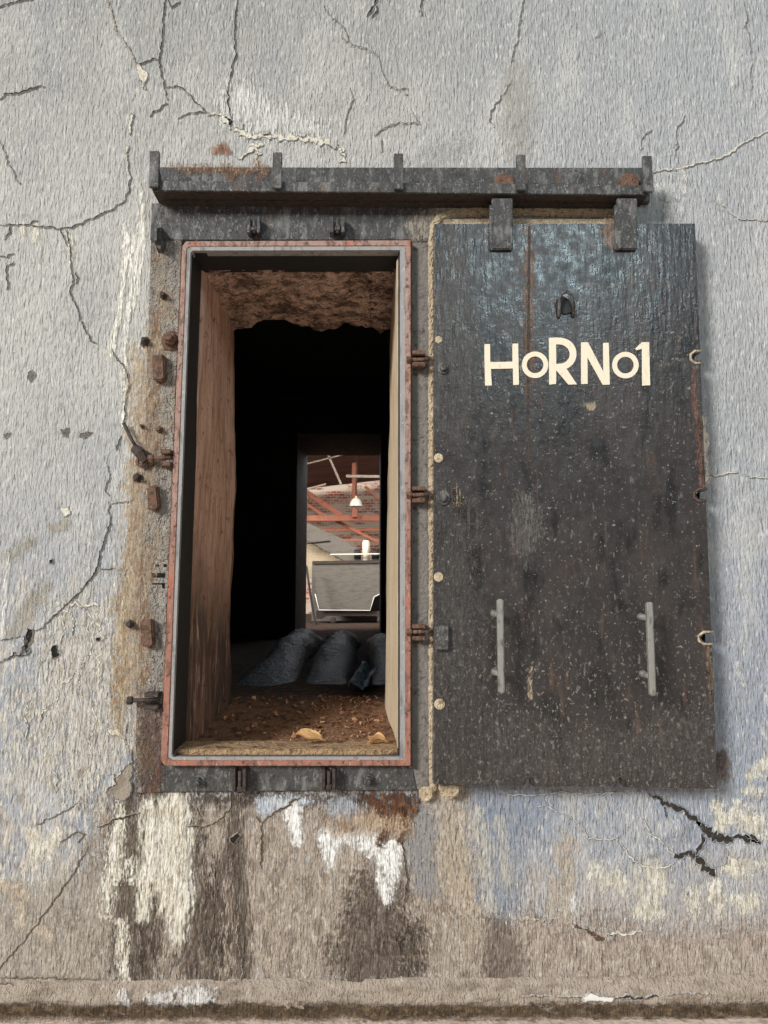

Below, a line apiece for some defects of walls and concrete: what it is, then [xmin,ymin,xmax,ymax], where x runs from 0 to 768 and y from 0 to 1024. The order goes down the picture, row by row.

crack [0,0,33,9]
crack [0,85,45,101]
crack [106,0,239,121]
corrosion [165,141,272,181]
crack [322,0,420,152]
crack [488,0,524,127]
crack [639,113,768,188]
crack [0,154,135,664]
crack [0,800,140,986]
corrosion [326,791,420,847]
water stain [0,504,768,1015]
crack [536,793,761,877]